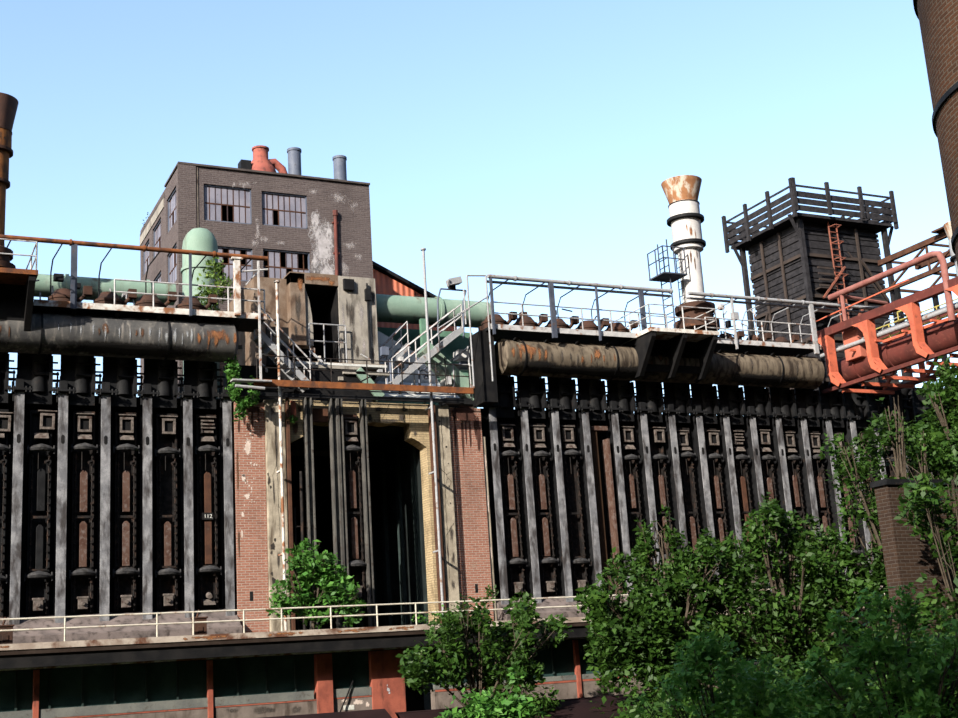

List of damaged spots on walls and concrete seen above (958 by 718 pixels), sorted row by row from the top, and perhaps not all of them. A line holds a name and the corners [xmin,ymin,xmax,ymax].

corrosion [198,330,237,349]
corrosion [512,344,547,361]
spalling [241,425,257,517]